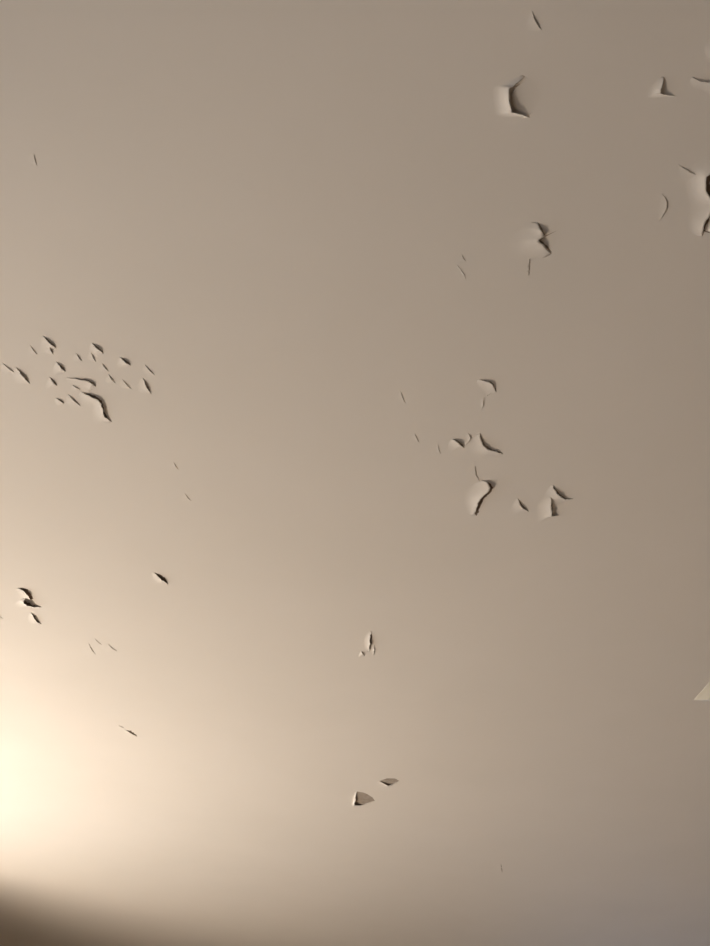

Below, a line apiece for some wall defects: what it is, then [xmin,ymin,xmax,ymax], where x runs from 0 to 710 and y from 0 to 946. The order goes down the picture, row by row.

peeling [493,75,541,118]
peeling [646,77,675,98]
peeling [678,155,710,236]
peeling [509,222,552,275]
peeling [28,336,155,423]
peeling [448,433,503,516]
peeling [510,485,572,522]
peeling [14,588,41,625]
peeling [358,631,375,658]
peeling [351,792,375,808]
peeling [378,778,399,789]